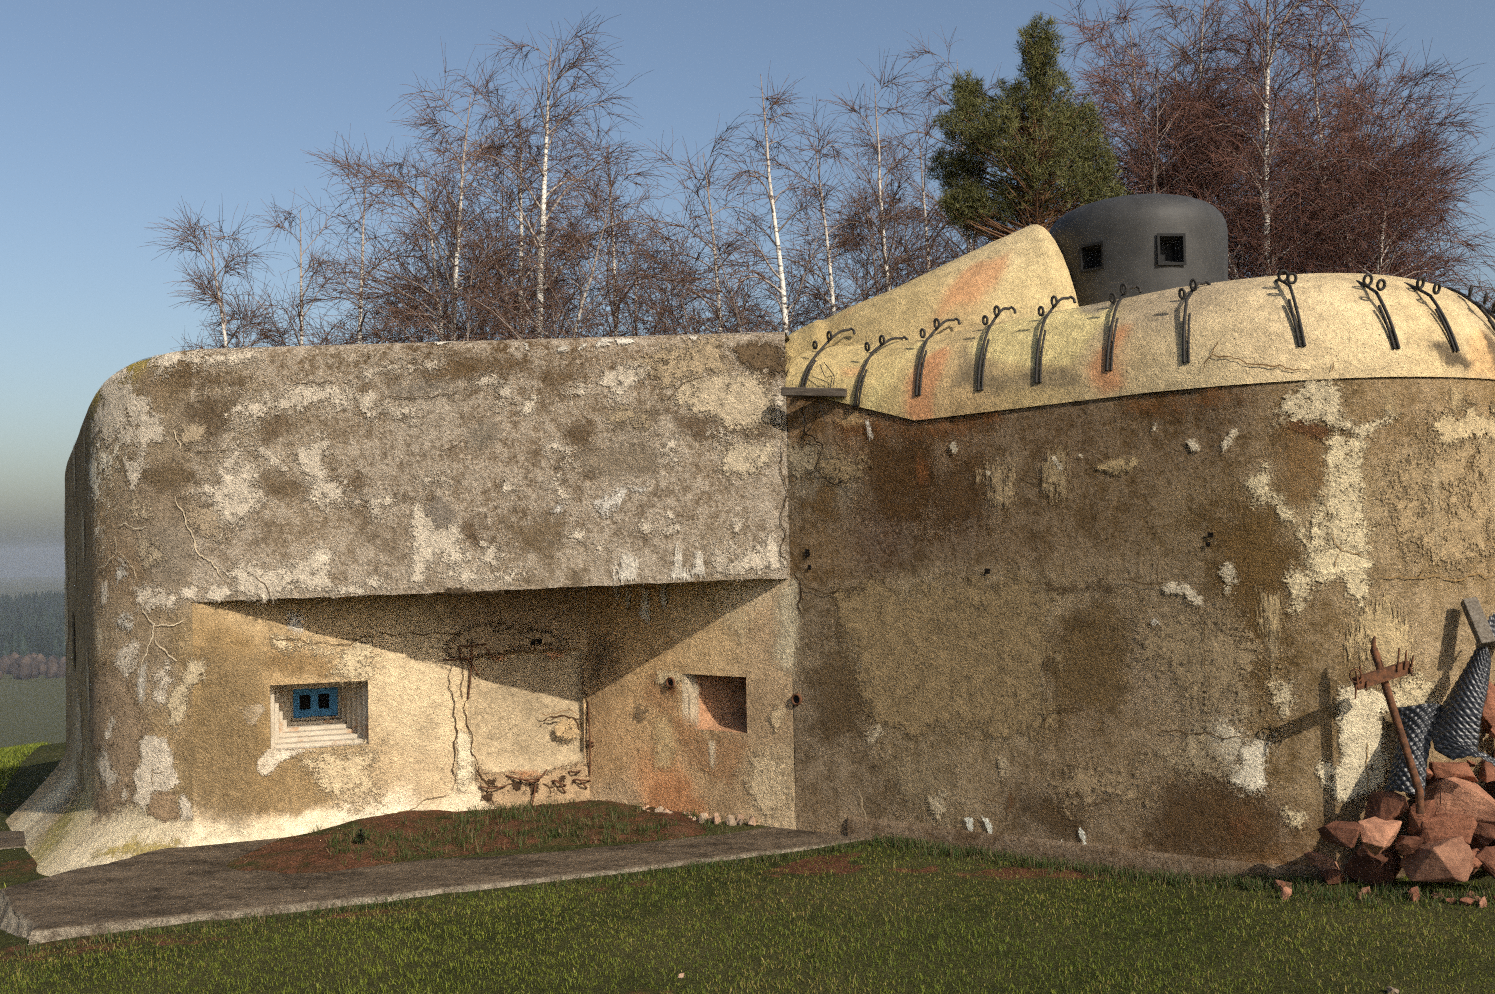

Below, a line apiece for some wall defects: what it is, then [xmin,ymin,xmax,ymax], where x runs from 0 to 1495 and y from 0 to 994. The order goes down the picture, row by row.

crack [1202,342,1334,372]
crack [95,523,184,667]
peeling [96,638,211,821]
crack [175,497,270,595]
peeling [87,341,540,615]
spalling [438,620,595,808]
crack [780,402,871,615]
water stain [858,420,1020,521]
water stain [1038,445,1083,507]
crack [1043,650,1085,736]
water stain [1040,580,1132,717]
peeling [1113,379,1495,806]